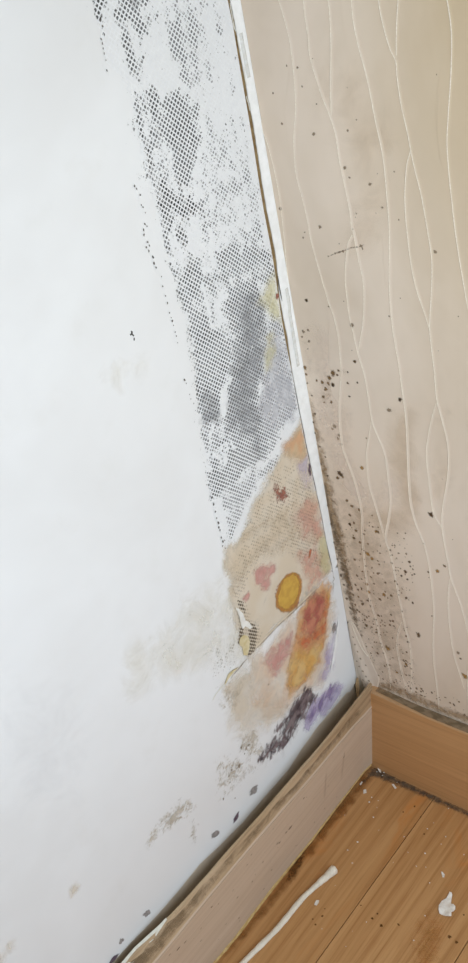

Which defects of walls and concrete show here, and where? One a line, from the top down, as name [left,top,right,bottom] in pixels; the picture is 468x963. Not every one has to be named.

water stain [93,0,468,762]
peeling [235,607,252,655]
water stain [132,912,182,963]